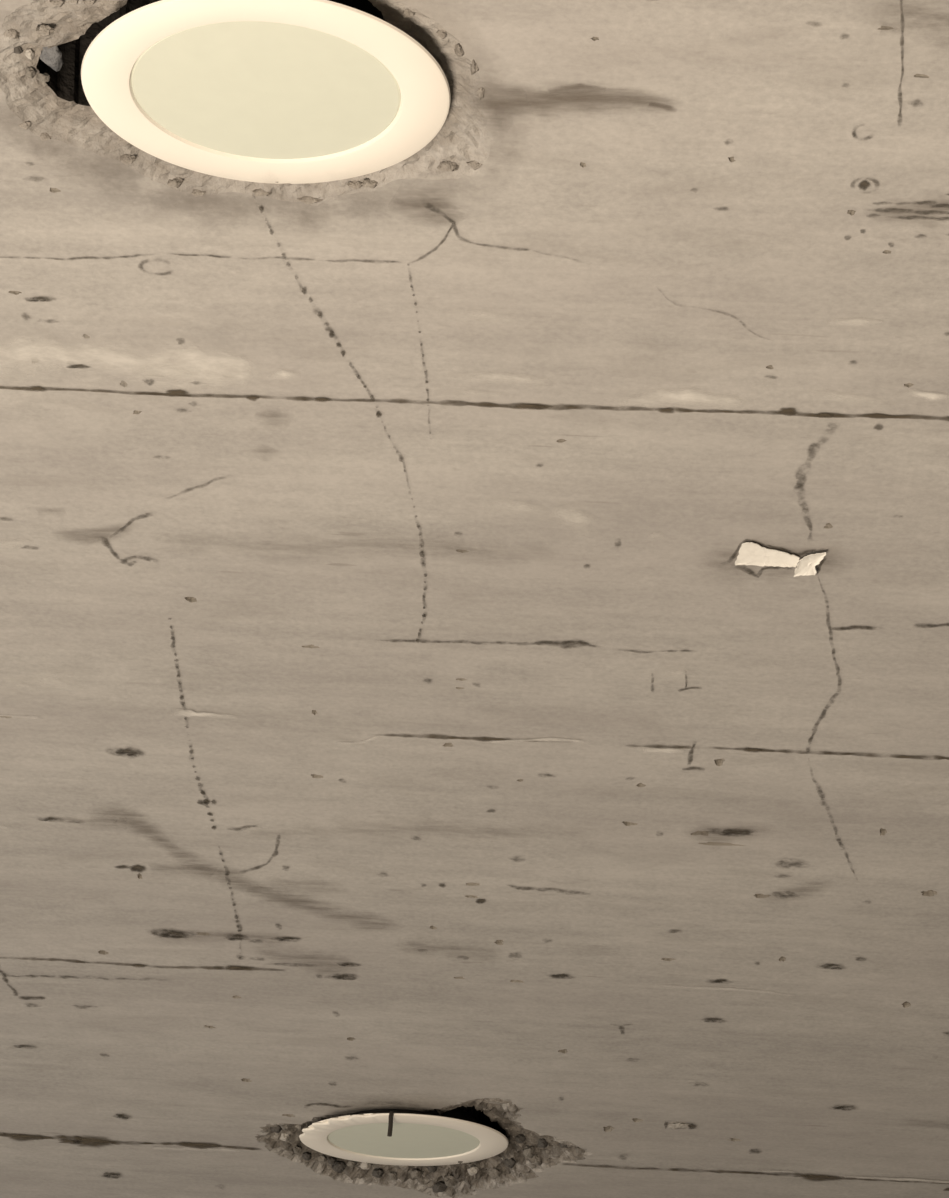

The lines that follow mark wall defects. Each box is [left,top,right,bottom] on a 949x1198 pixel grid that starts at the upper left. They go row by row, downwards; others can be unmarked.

spalling [0,0,496,206]
crack [897,14,905,117]
crack [302,289,381,417]
crack [393,526,501,644]
peeling [732,540,826,577]
crack [535,640,585,648]
crack [809,591,872,742]
crack [190,750,255,830]
crack [0,971,73,1000]
spalling [255,1098,593,1198]